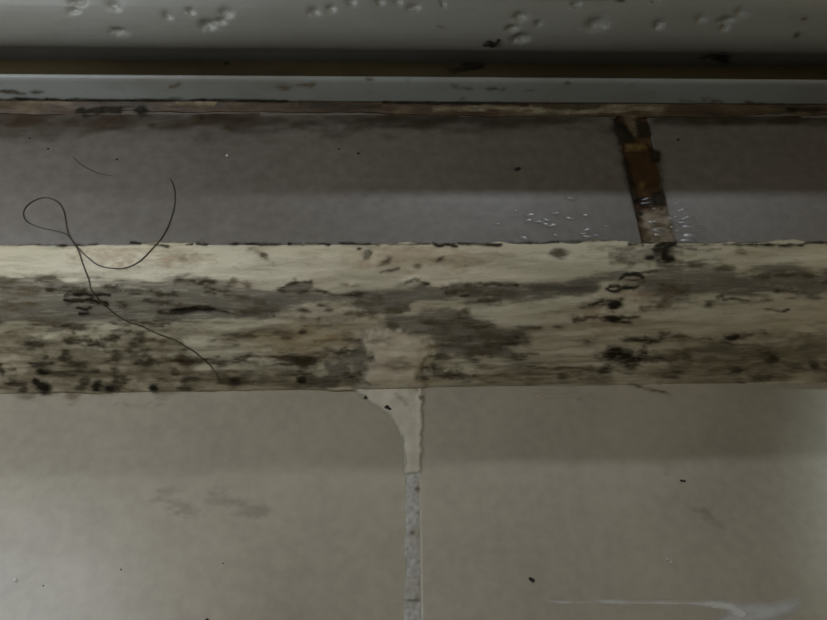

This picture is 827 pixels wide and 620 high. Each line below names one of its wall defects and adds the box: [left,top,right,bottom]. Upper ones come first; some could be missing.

leakage [0,225,827,395]
leakage [654,602,795,620]